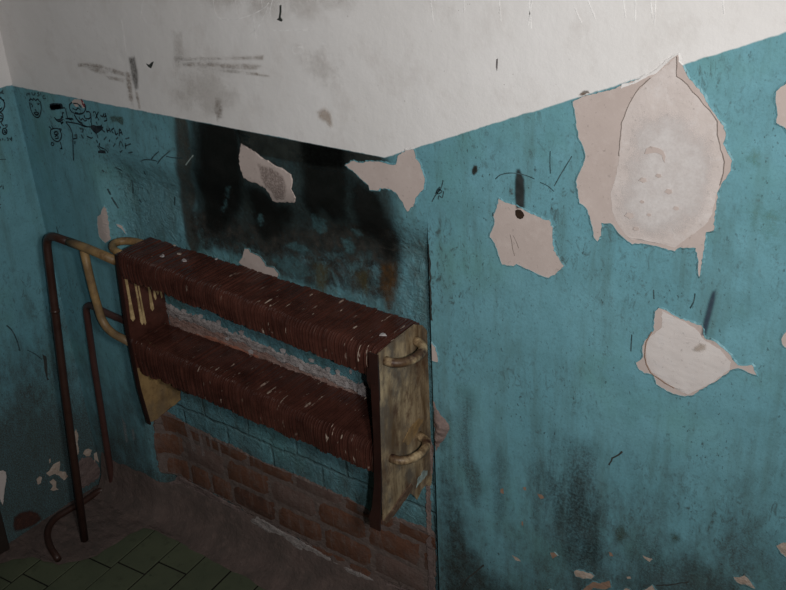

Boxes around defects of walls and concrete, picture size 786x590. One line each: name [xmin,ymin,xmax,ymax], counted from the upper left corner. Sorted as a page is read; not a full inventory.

peeling [773,81,786,134]
peeling [239,145,296,203]
peeling [345,147,427,213]
peeling [571,52,734,278]
peeling [239,248,280,278]
peeling [488,196,565,279]
peeling [634,306,759,398]
peeling [37,459,68,491]
peeling [75,430,100,488]
spalling [153,411,437,590]
peeling [573,569,612,590]
peeling [732,573,756,589]